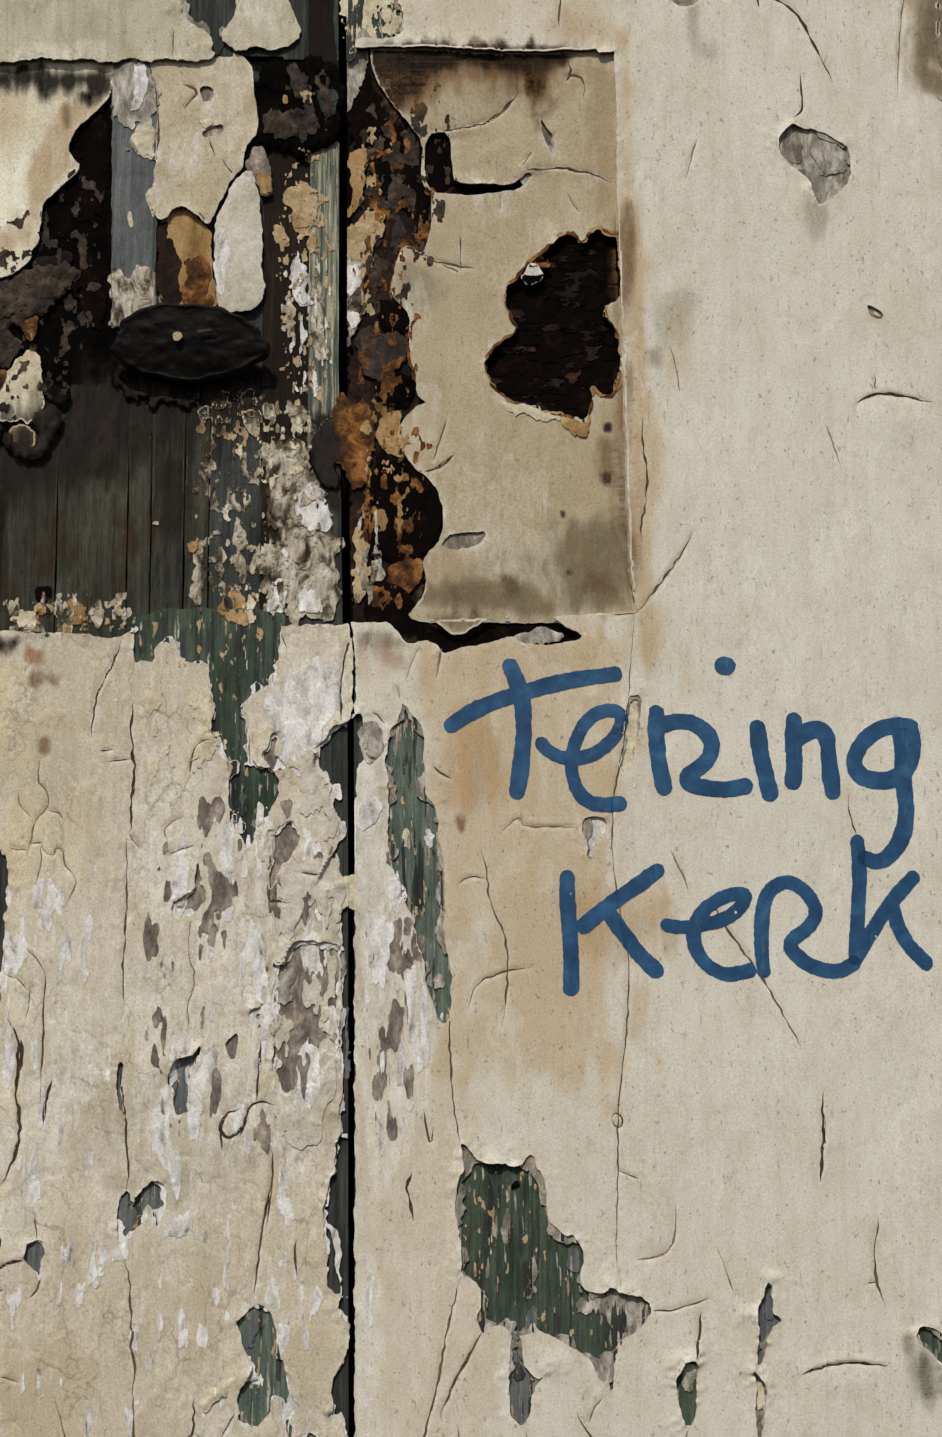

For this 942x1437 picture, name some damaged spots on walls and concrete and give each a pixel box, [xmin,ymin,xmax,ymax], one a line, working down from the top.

leakage [64,91,95,123]
peeling [108,57,162,160]
peeling [180,0,236,56]
crack [757,0,833,116]
peeling [779,124,851,204]
rust [155,208,217,306]
rust [308,56,457,640]
crack [91,641,193,1020]
peeling [0,127,591,1437]
crack [1,949,52,1184]
crack [423,1275,483,1437]
peeling [455,1144,651,1425]